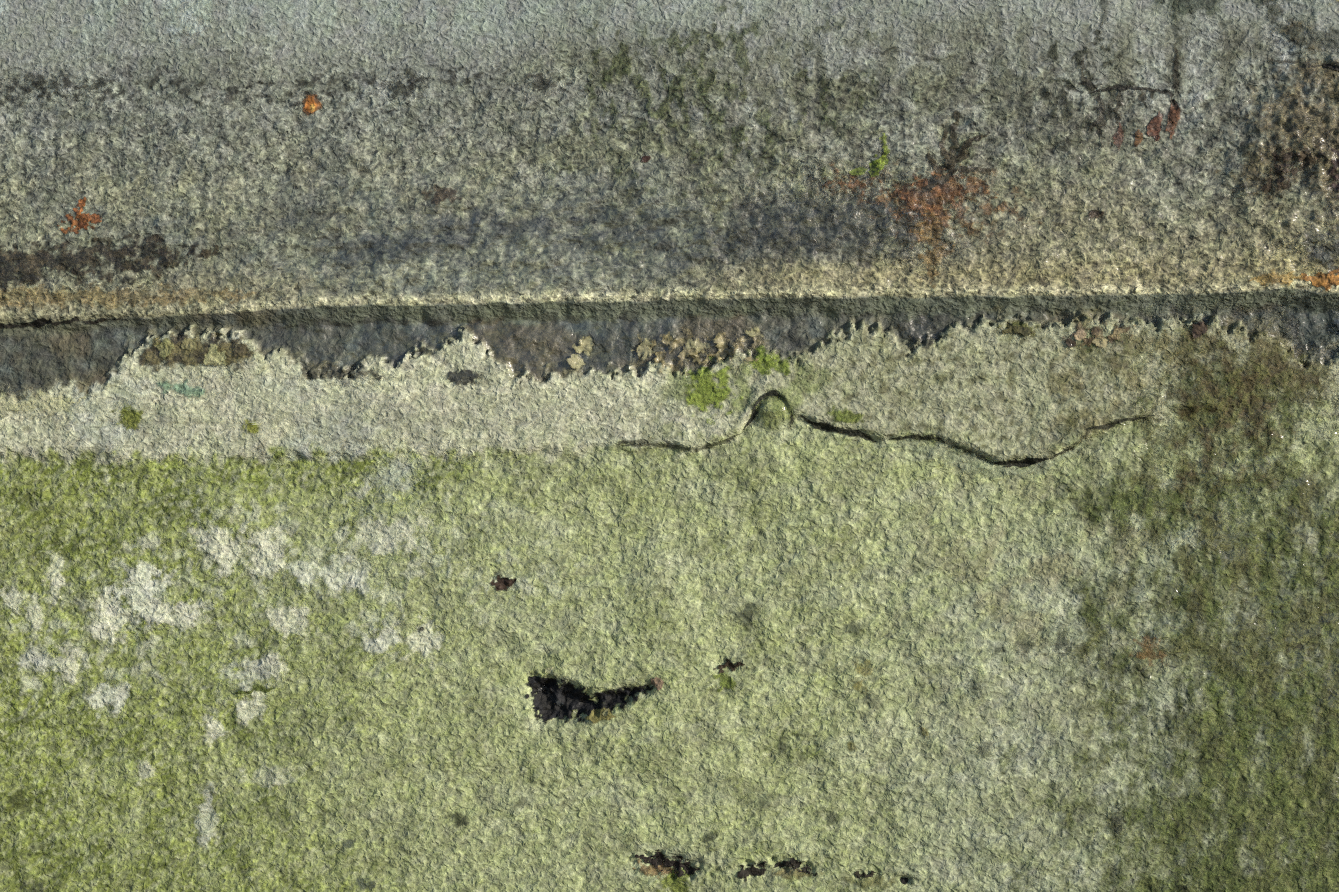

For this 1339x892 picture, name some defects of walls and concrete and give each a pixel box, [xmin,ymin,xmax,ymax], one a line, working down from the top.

corrosion [1113,99,1181,150]
corrosion [57,197,102,234]
corrosion [824,162,1022,241]
damp [0,233,227,292]
spalling [138,333,257,371]
spalling [631,327,765,372]
crack [743,390,945,443]
crack [1089,414,1156,430]
damp [1165,320,1328,519]
crack [994,458,1050,467]
spalling [633,850,700,892]
spalling [737,858,818,882]